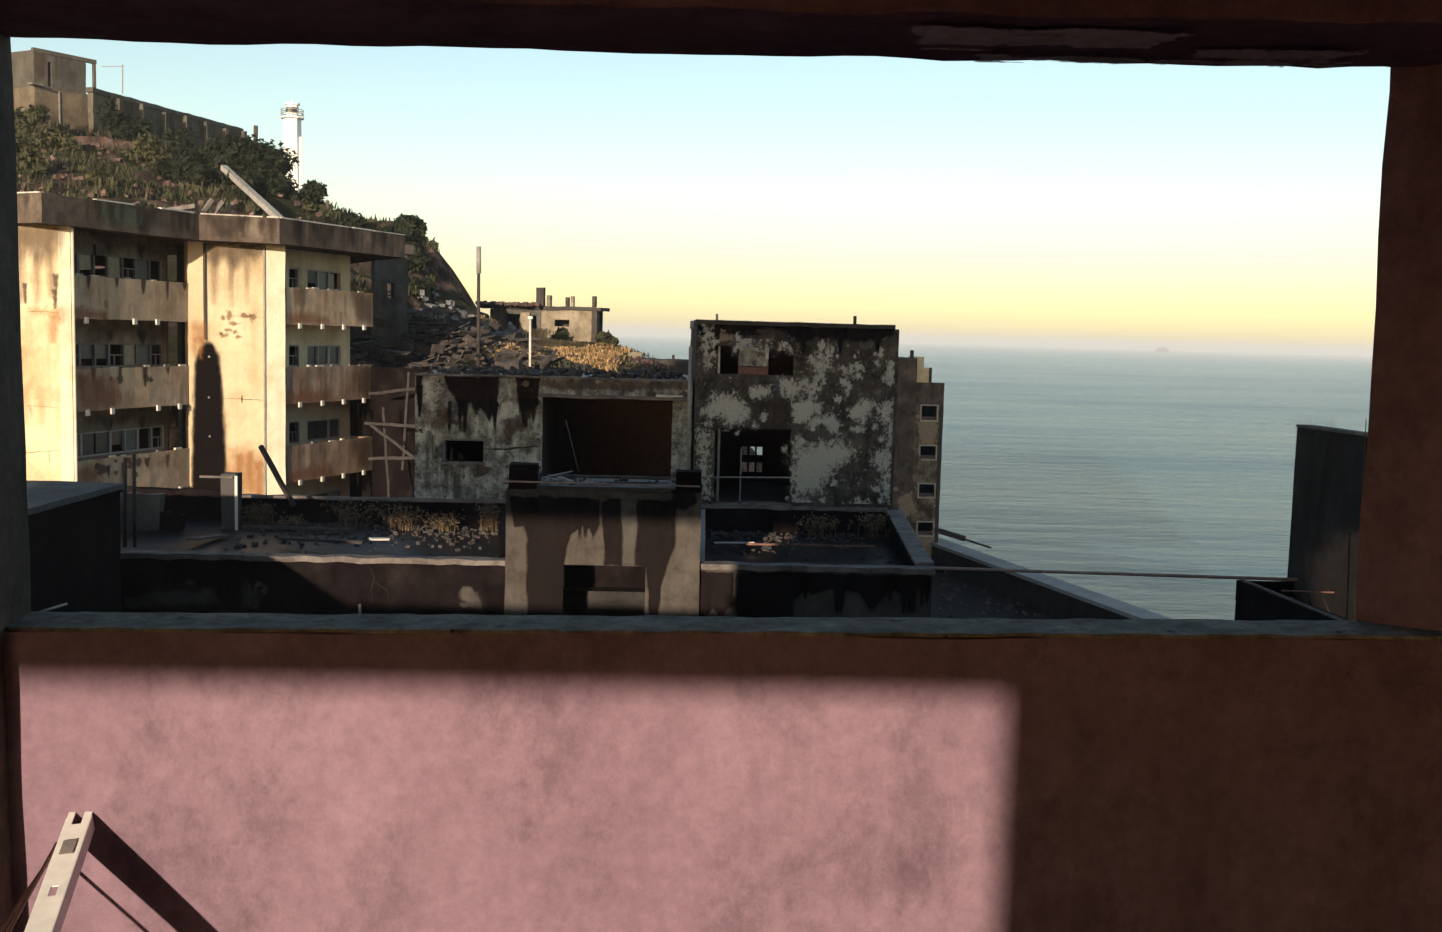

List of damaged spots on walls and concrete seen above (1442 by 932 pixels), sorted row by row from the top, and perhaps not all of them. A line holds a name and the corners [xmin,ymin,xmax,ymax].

rust [76,301,108,321]
rust [79,375,115,408]
water stain [415,375,423,416]
water stain [426,373,540,499]
peeling [504,411,533,445]
peeling [520,324,916,518]
peeling [914,414,939,451]
water stain [509,495,677,615]
water stain [699,571,930,618]